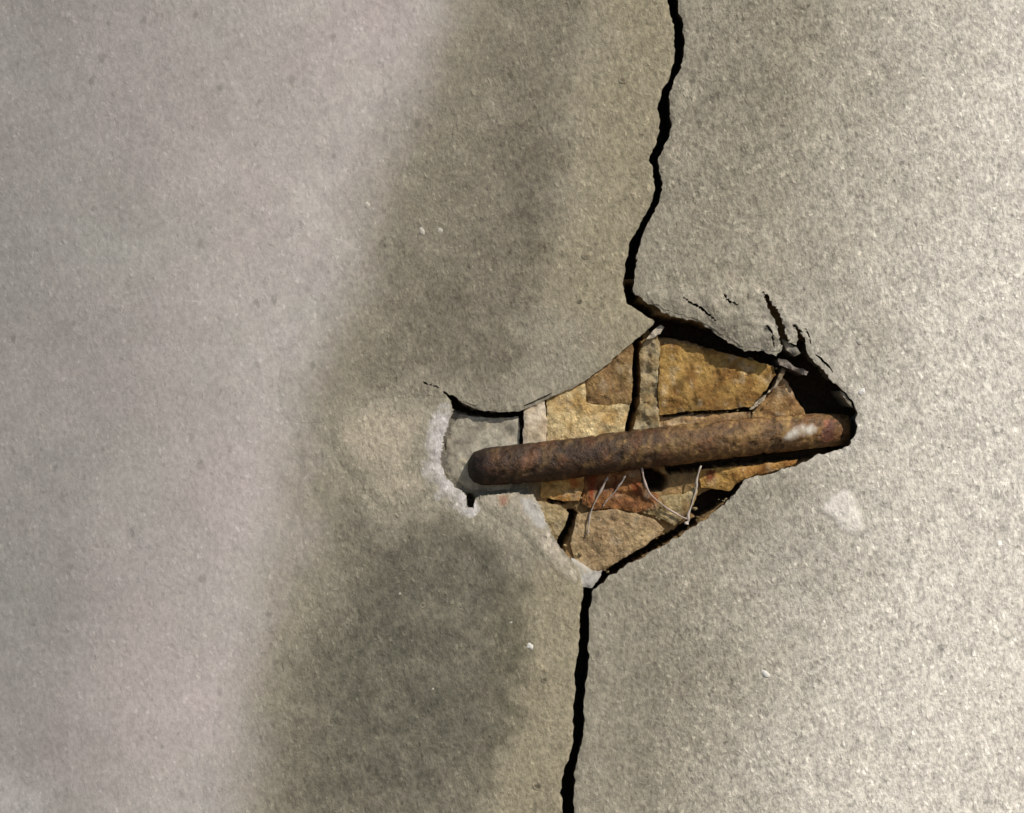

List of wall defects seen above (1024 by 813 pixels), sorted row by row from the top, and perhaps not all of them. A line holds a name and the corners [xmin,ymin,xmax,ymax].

crack [623,0,685,294]
water stain [203,0,596,813]
spalling [440,279,858,589]
peeling [822,490,866,536]
crack [560,587,593,813]